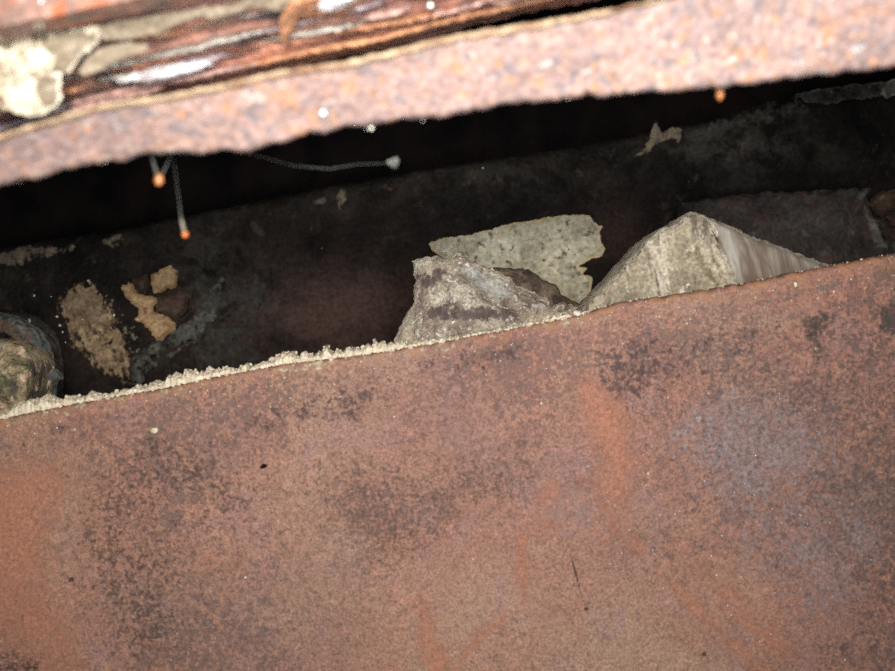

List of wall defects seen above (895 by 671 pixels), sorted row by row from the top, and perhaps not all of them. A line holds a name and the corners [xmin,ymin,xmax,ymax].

peeling [0,0,302,117]
rust [0,0,597,134]
peeling [636,123,682,156]